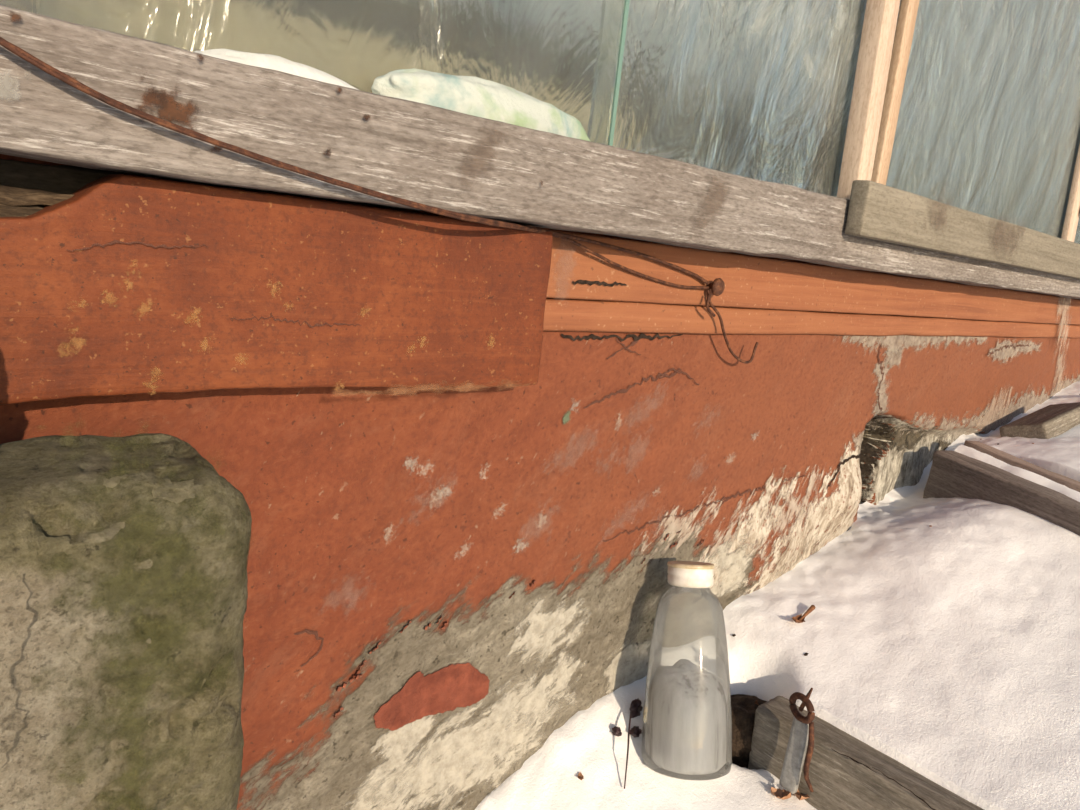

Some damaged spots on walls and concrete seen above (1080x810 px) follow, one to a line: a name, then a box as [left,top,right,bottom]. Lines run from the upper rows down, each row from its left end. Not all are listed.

corrosion [137,87,199,131]
peeling [842,335,1042,362]
spalling [854,348,1080,505]
peeling [239,520,759,810]